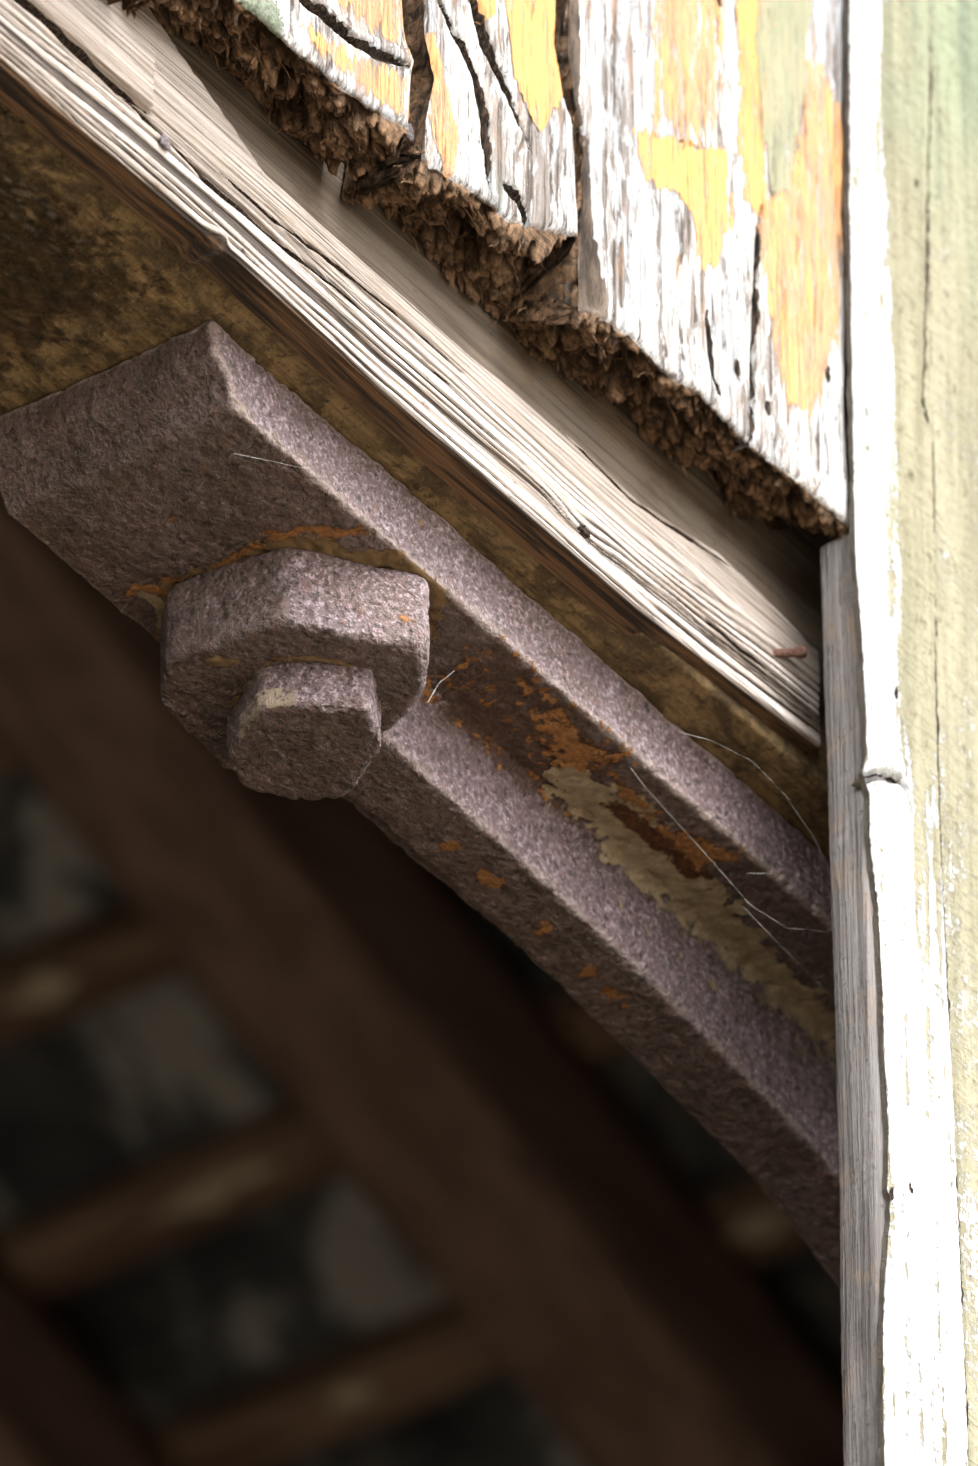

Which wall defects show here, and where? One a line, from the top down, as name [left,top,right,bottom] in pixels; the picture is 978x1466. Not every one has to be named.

crack [13,0,461,385]
peeling [302,0,460,178]
crack [439,0,529,226]
peeling [474,0,563,132]
corrosion [125,519,450,643]
peeling [633,0,978,1466]
corrosion [420,635,837,1091]